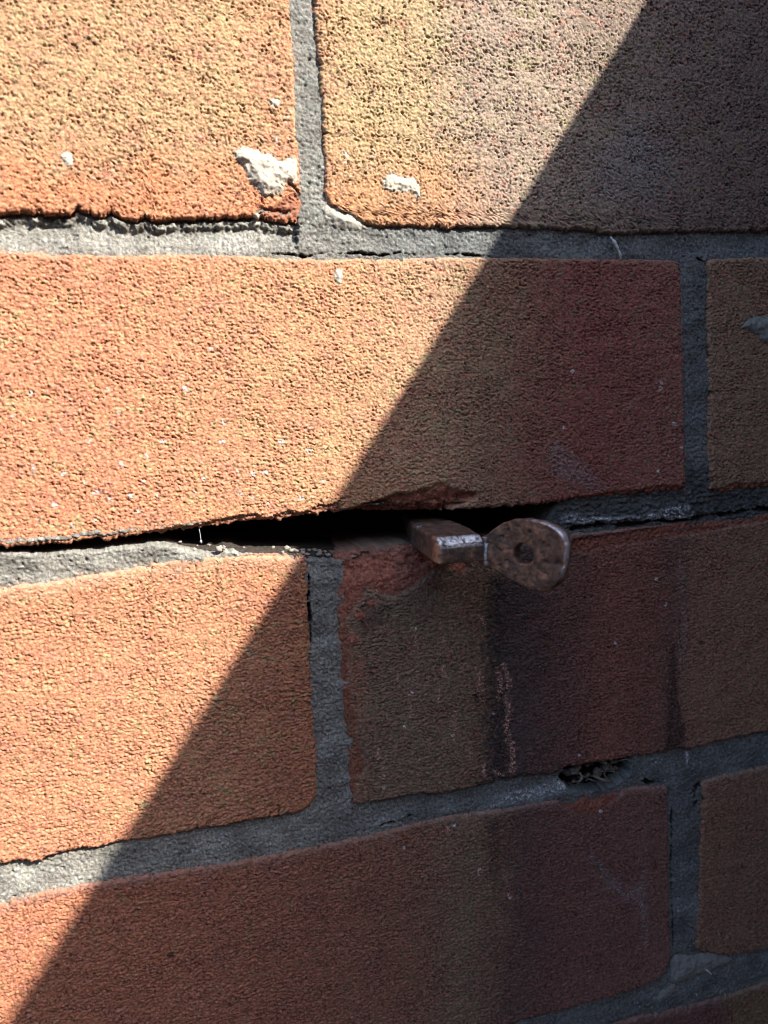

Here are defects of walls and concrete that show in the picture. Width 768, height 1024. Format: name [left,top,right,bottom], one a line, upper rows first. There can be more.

crack [0,502,554,643]
crack [569,506,768,531]